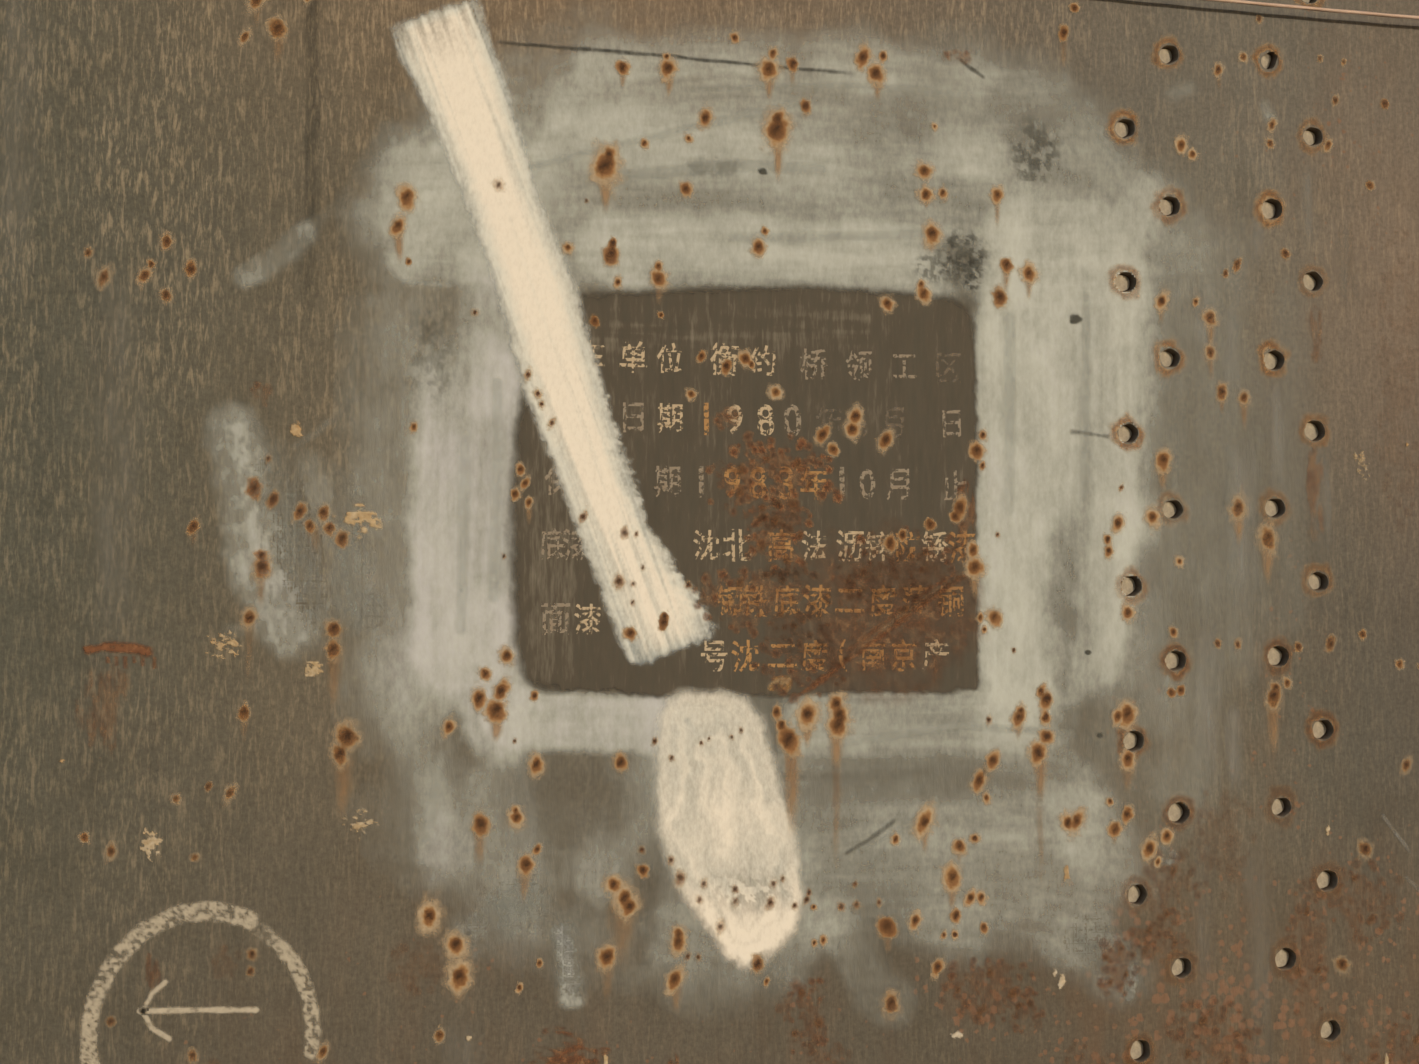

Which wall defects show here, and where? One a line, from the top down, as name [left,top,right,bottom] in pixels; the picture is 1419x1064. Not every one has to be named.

rust [615,60,631,82]
rust [660,53,678,91]
rust [854,44,887,95]
rust [685,109,713,143]
rust [758,48,811,172]
rust [586,145,623,204]
rust [968,430,987,470]
rust [840,482,985,612]
rust [1104,514,1125,558]
rust [687,405,863,814]
rust [977,609,1003,634]
rust [417,900,472,996]